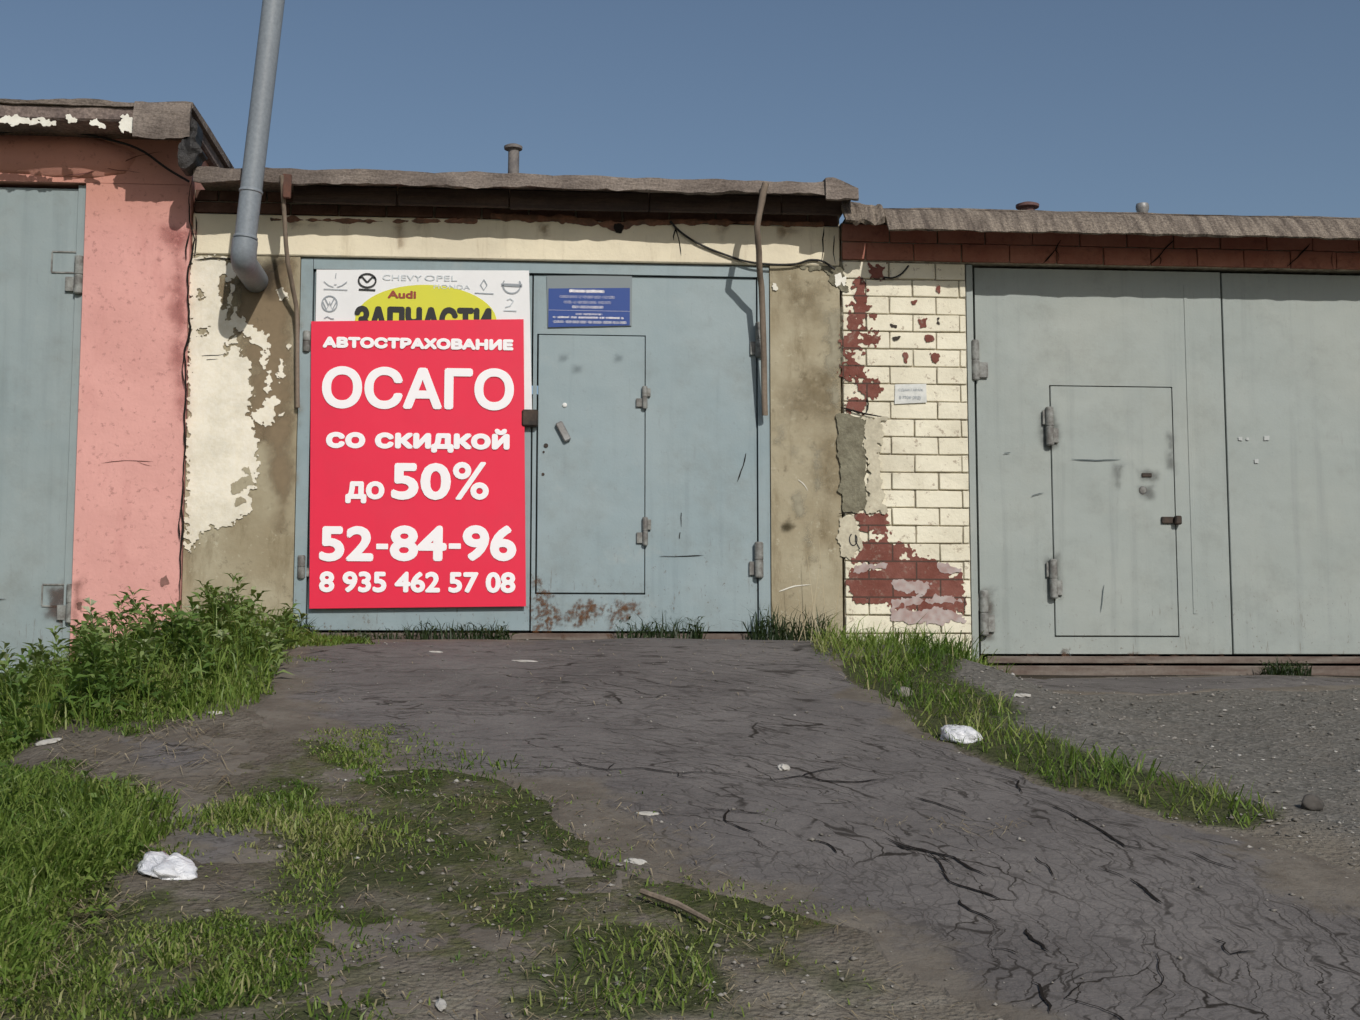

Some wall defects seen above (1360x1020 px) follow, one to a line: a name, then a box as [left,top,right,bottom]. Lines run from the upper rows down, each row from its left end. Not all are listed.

peeling [0,114,133,133]
peeling [799,259,909,416]
peeling [911,300,940,363]
peeling [183,254,292,552]
corrosion [532,579,640,633]
peeling [836,513,967,626]